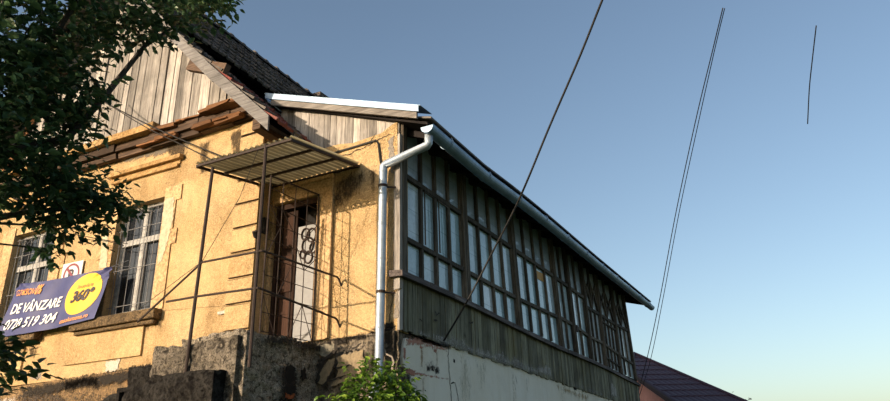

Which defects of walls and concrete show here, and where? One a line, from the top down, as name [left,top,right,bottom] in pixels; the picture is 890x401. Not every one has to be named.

damp [334,170,375,212]
peeling [384,333,551,379]
damp [3,363,151,401]